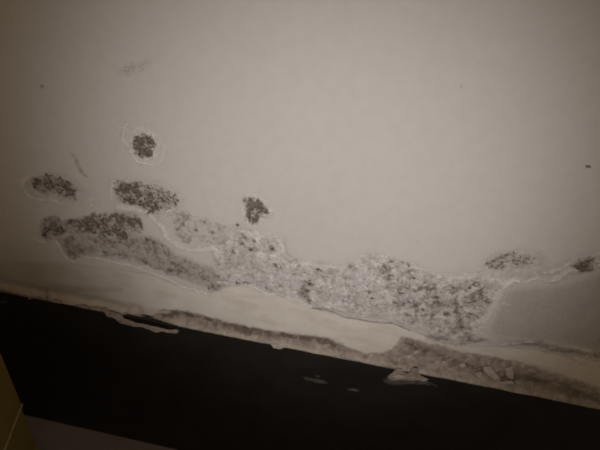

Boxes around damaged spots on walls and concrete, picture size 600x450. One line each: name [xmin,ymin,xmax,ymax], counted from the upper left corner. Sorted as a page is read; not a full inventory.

damp [116,121,168,170]
damp [18,170,600,345]
peeling [0,277,600,409]